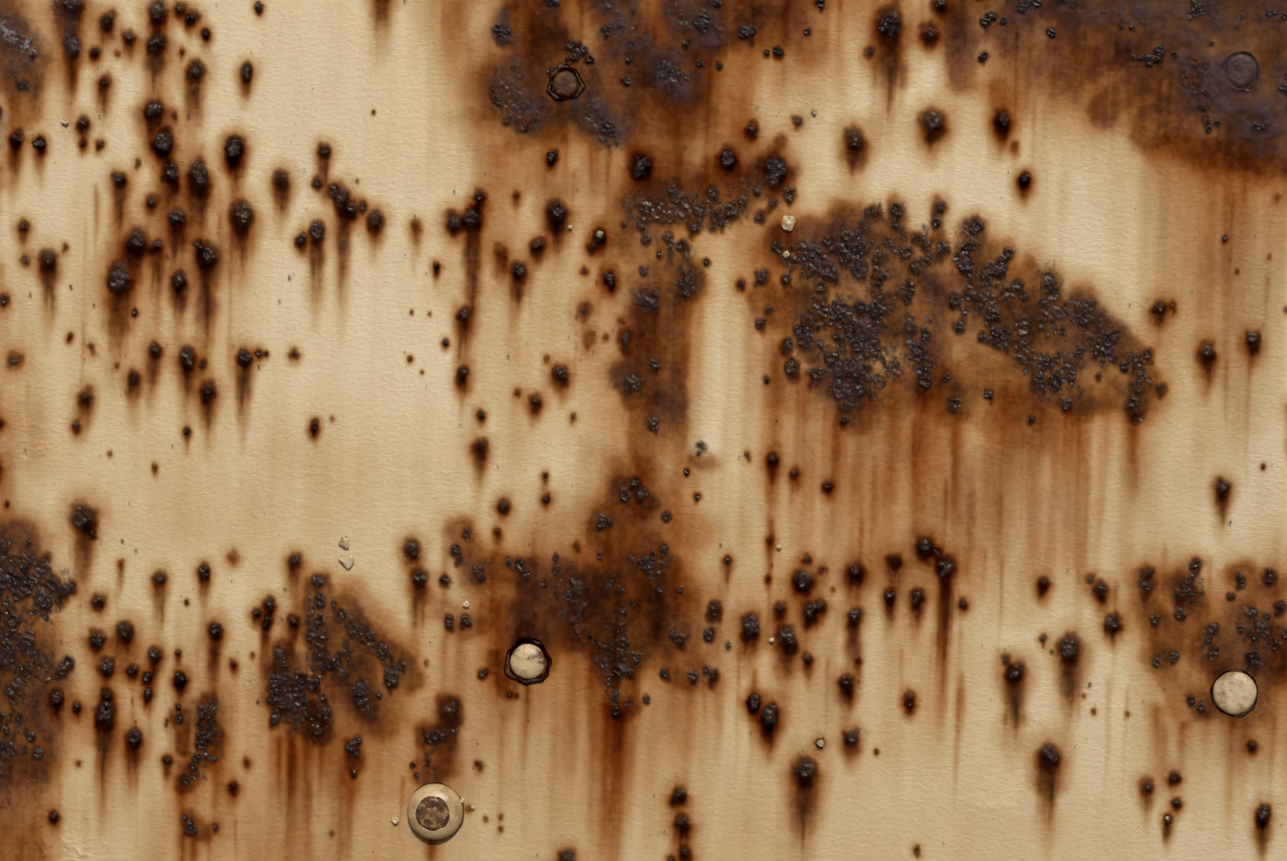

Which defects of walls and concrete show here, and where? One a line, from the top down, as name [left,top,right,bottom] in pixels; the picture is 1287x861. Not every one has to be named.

corrosion [864,0,1287,177]
corrosion [272,168,289,211]
corrosion [294,141,385,277]
corrosion [152,426,190,472]
corrosion [233,345,269,409]
corrosion [403,0,1168,795]
corrosion [1149,299,1187,327]
corrosion [0,501,224,861]
corrosion [207,552,428,779]
corrosion [1086,556,1287,722]
corrosion [791,737,825,840]
corrosion [1037,741,1075,813]